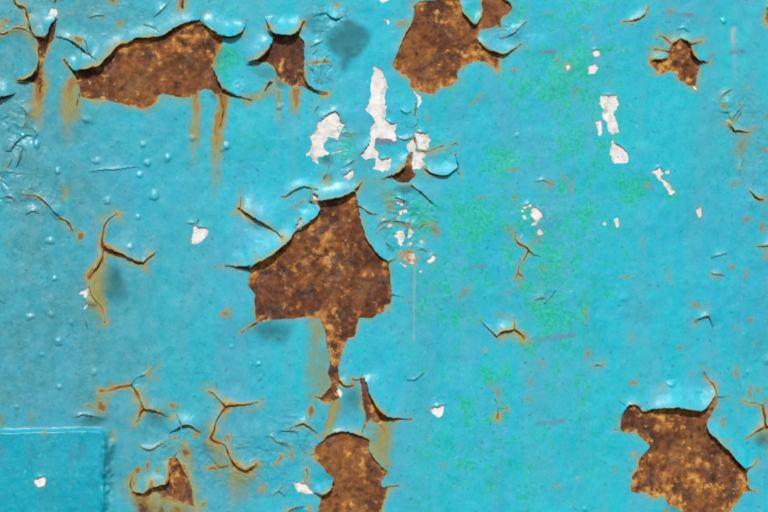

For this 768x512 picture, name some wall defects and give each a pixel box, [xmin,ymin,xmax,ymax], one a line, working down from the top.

corrosion [62,0,330,158]
peeling [306,108,352,164]
peeling [358,66,397,172]
peeling [407,130,431,169]
corrosion [393,0,521,94]
peeling [596,94,628,164]
crack [84,211,155,329]
corrosion [223,176,411,512]
crack [482,320,526,342]
crack [98,365,260,482]
corrosion [613,373,758,512]
crack [742,400,768,440]